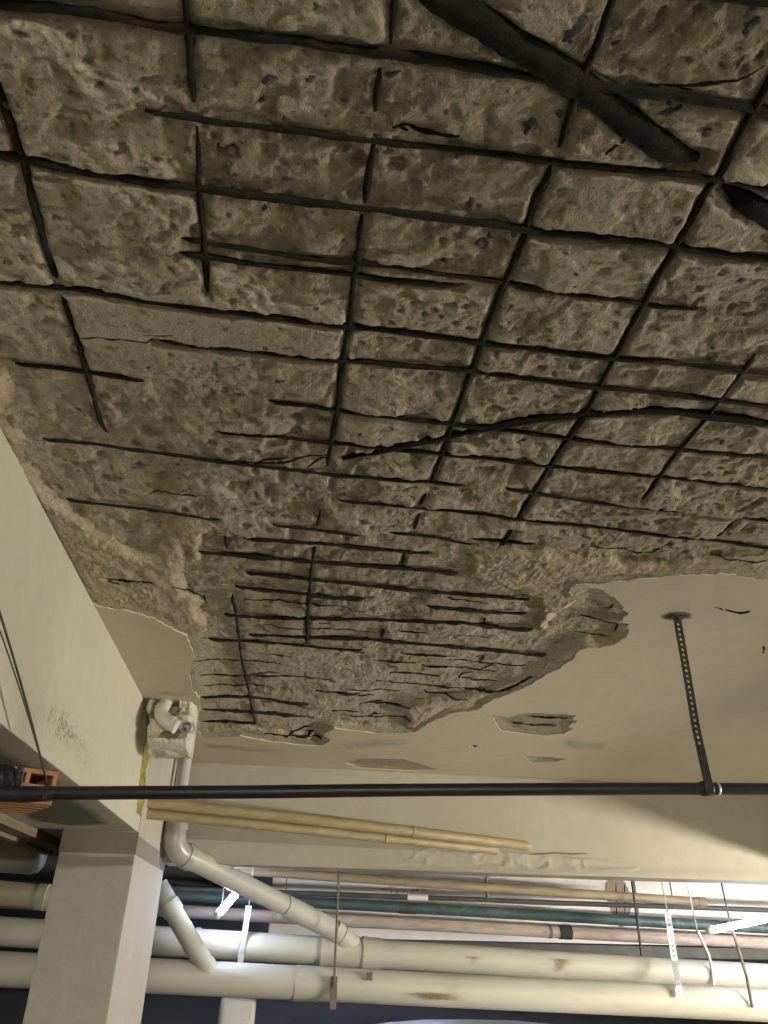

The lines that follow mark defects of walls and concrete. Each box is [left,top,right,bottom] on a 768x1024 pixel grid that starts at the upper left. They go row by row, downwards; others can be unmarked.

spalling [0,0,768,745]